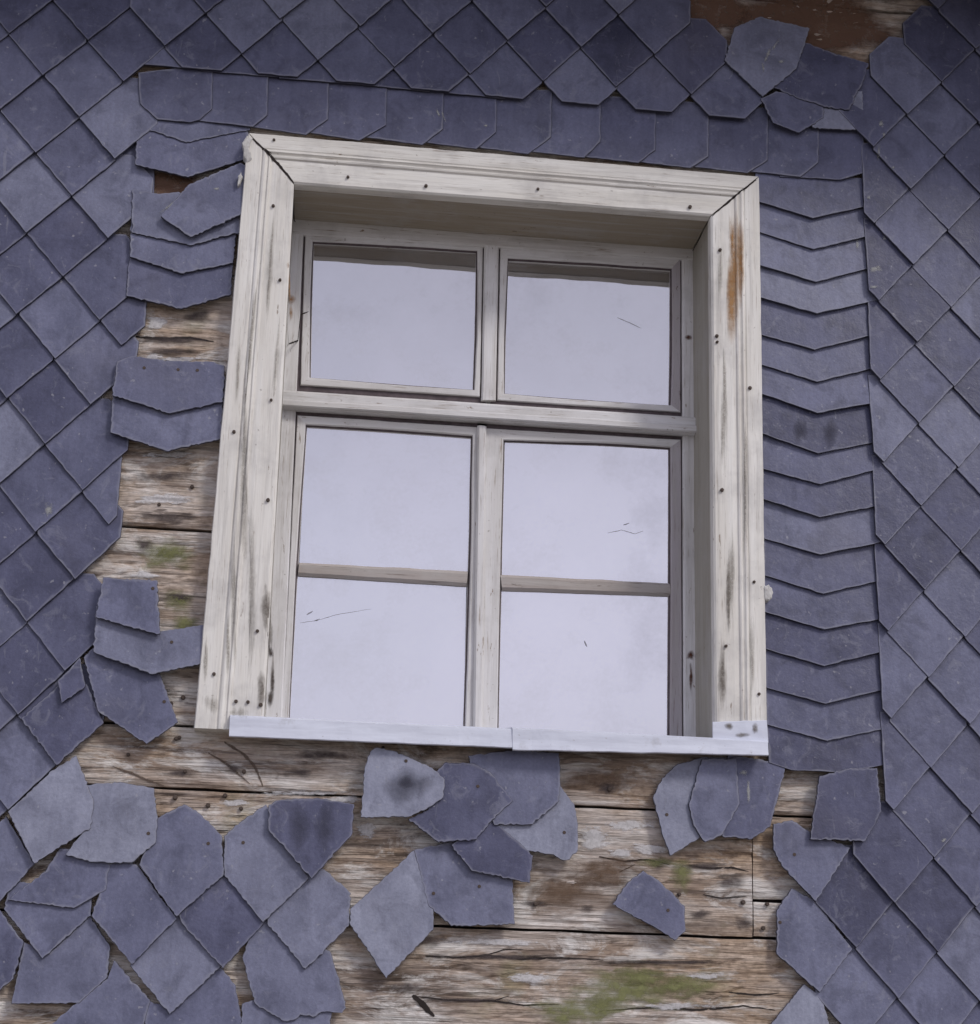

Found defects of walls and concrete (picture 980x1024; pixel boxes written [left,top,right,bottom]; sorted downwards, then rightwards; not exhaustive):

peeling [690,0,893,50]
rust [729,234,743,320]
peeling [146,317,167,329]
peeling [264,790,357,802]
peeling [579,820,668,856]
peeling [511,972,546,986]